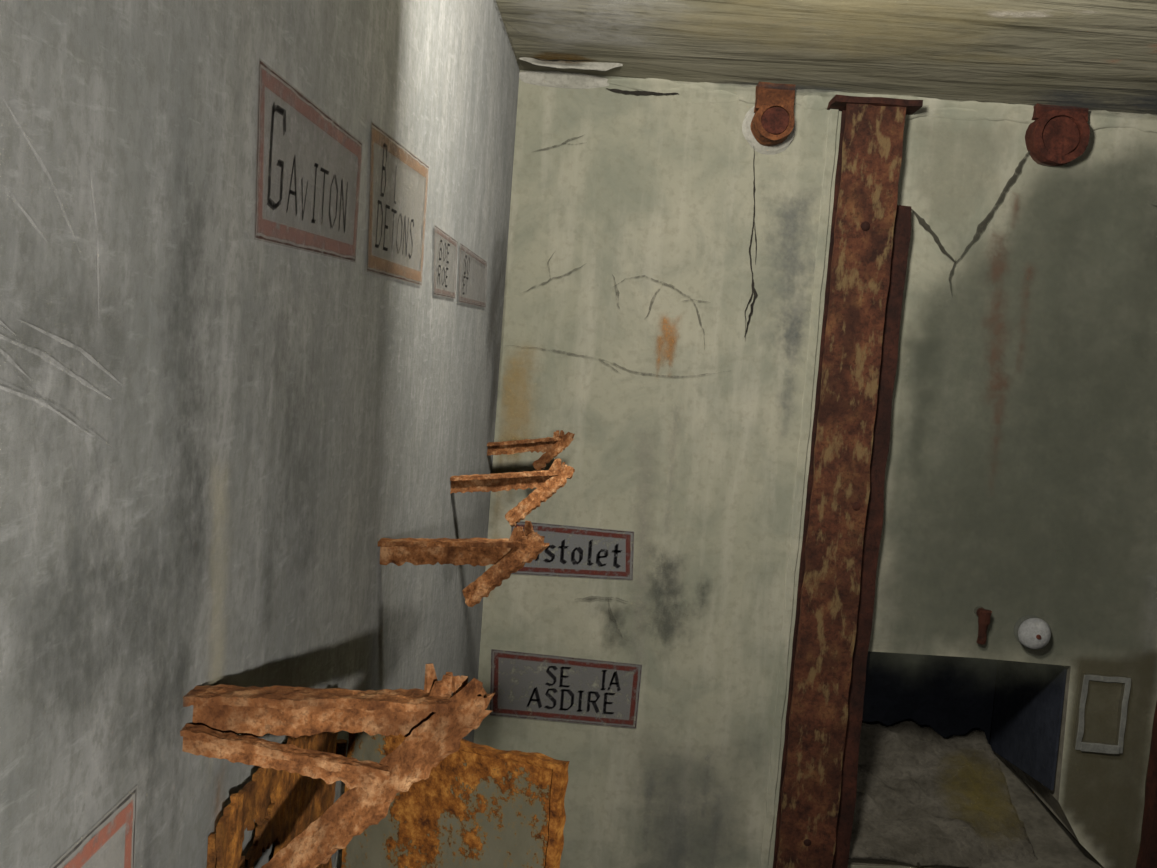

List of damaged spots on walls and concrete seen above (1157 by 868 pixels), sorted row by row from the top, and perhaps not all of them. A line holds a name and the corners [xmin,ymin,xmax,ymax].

crack [527,253,582,291]
crack [744,146,758,338]
crack [911,151,1030,290]
crack [612,274,711,346]
crack [505,345,705,378]